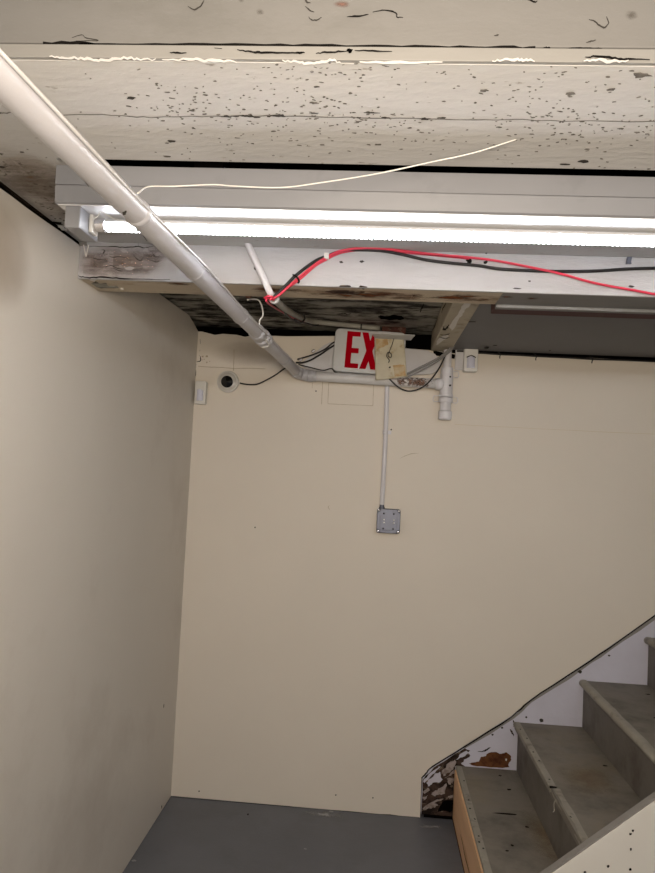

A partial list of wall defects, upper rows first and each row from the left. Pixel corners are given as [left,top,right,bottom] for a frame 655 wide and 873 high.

peeling [421,747,511,816]